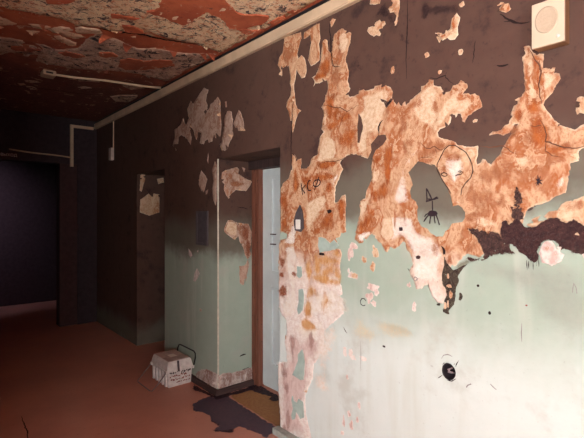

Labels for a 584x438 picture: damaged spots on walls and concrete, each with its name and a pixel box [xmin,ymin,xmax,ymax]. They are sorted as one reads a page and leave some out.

peeling [0,0,316,83]
peeling [367,20,386,36]
peeling [435,13,460,43]
crack [530,51,542,104]
peeling [173,88,245,151]
peeling [140,174,160,216]
peeling [224,220,252,285]
peeling [277,23,584,438]
spalling [196,367,253,389]
water stain [192,396,275,438]